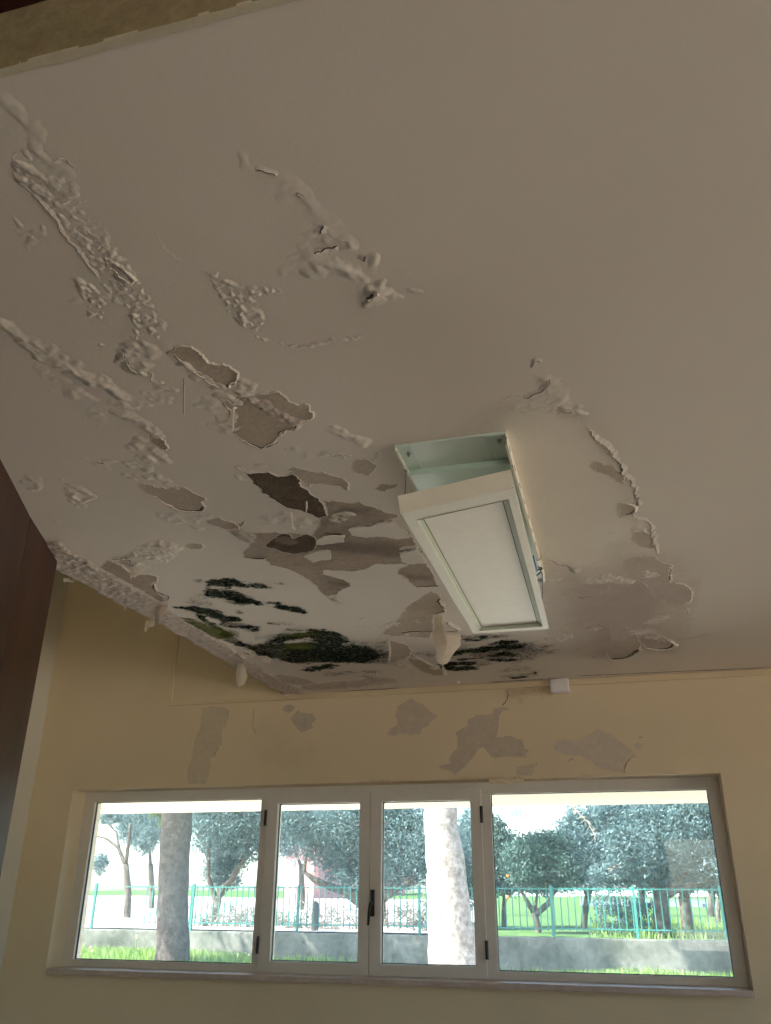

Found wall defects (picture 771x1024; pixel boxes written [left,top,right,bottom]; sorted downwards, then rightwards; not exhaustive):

peeling [150,435,170,451]
peeling [138,458,469,684]